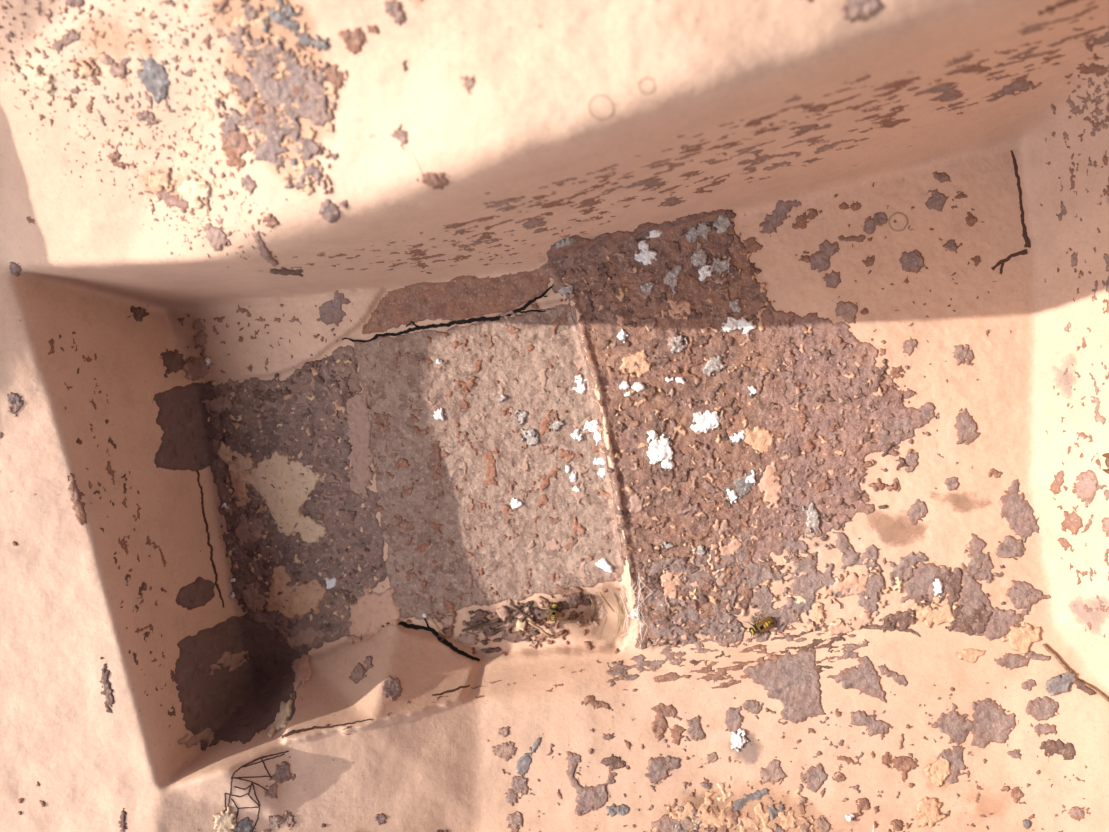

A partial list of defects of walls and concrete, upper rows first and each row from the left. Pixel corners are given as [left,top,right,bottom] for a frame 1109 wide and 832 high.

peeling [66,60,101,80]
peeling [148,167,211,209]
crack [991,150,1031,274]
crack [342,284,632,578]
corrosion [153,0,1109,751]
corrosion [67,419,215,613]
crack [188,395,224,608]
crack [382,618,480,696]
peeling [212,807,237,832]
corrosion [487,703,919,832]
peeling [910,756,951,828]
corrosion [919,679,1076,804]